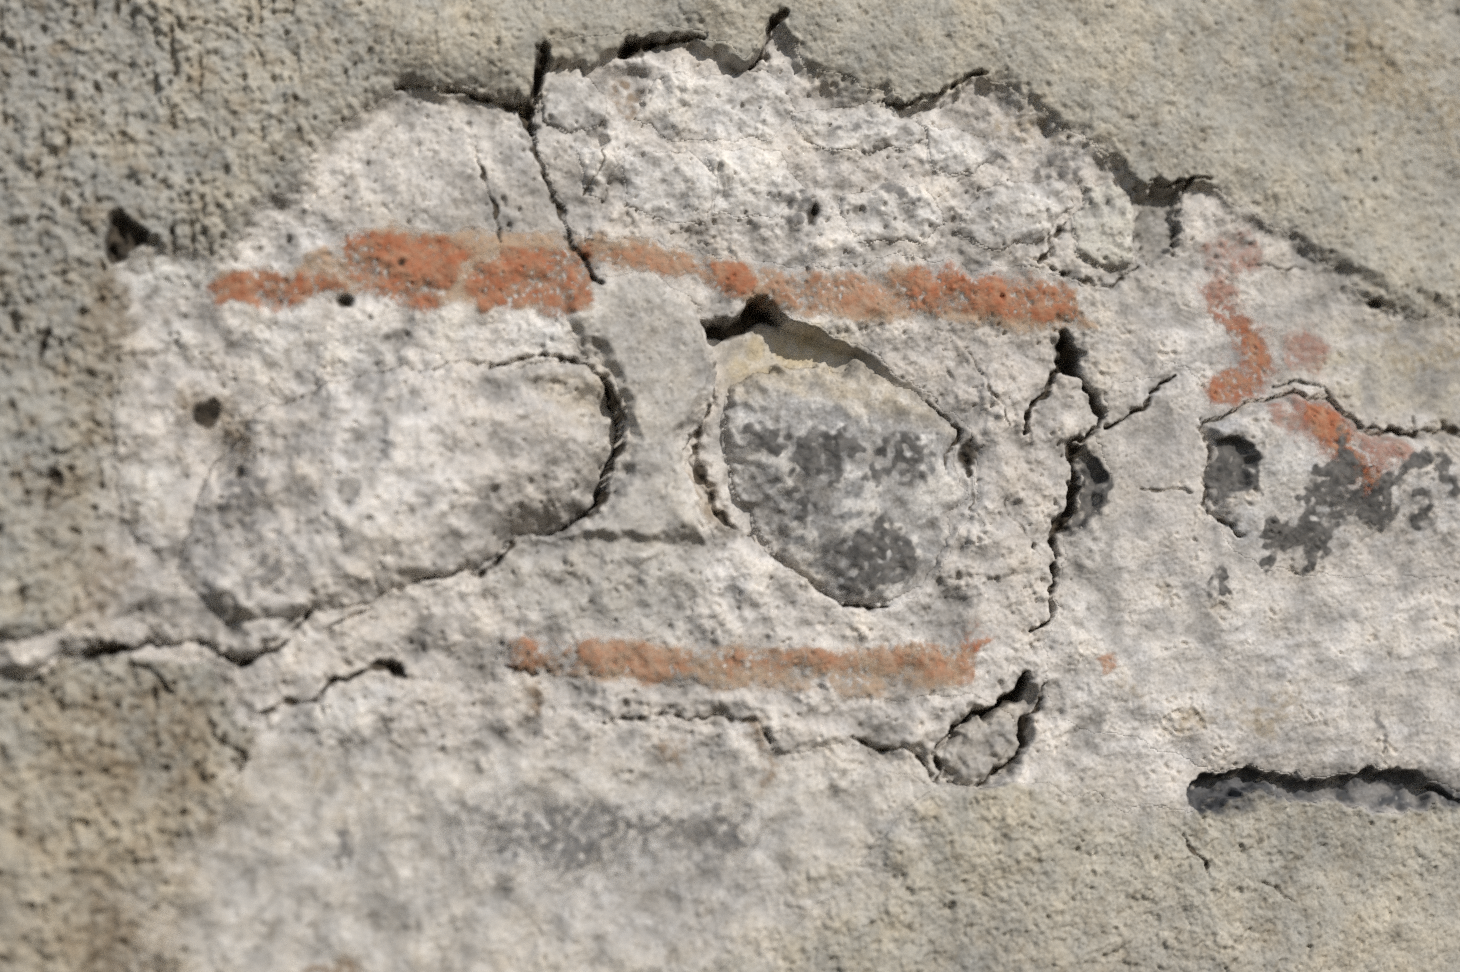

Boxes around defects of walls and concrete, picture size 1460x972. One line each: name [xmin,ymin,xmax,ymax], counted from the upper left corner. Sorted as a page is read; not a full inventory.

crack [1151,176,1211,247]
crack [1248,263,1306,271]
spalling [1044,292,1062,307]
peeling [1270,397,1381,490]
spalling [1089,482,1108,507]
crack [85,612,343,694]
peeling [1100,655,1115,671]
spalling [623,712,749,731]
spalling [1225,764,1460,814]
crack [1182,767,1460,871]